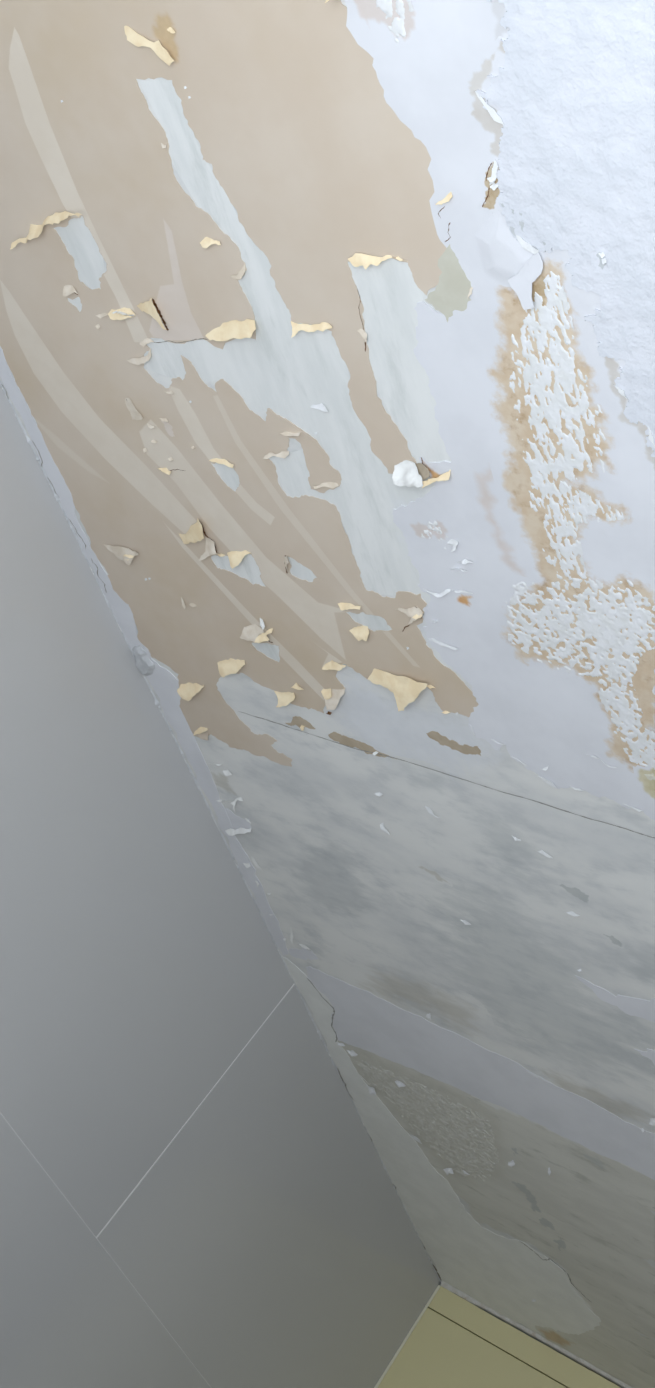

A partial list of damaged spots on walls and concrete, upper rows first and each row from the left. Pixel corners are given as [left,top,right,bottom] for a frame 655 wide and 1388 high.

peeling [0,0,478,767]
leakage [467,246,655,802]
peeling [475,0,655,457]
peeling [216,797,251,836]
leakage [275,823,393,931]
leakage [343,756,655,1131]